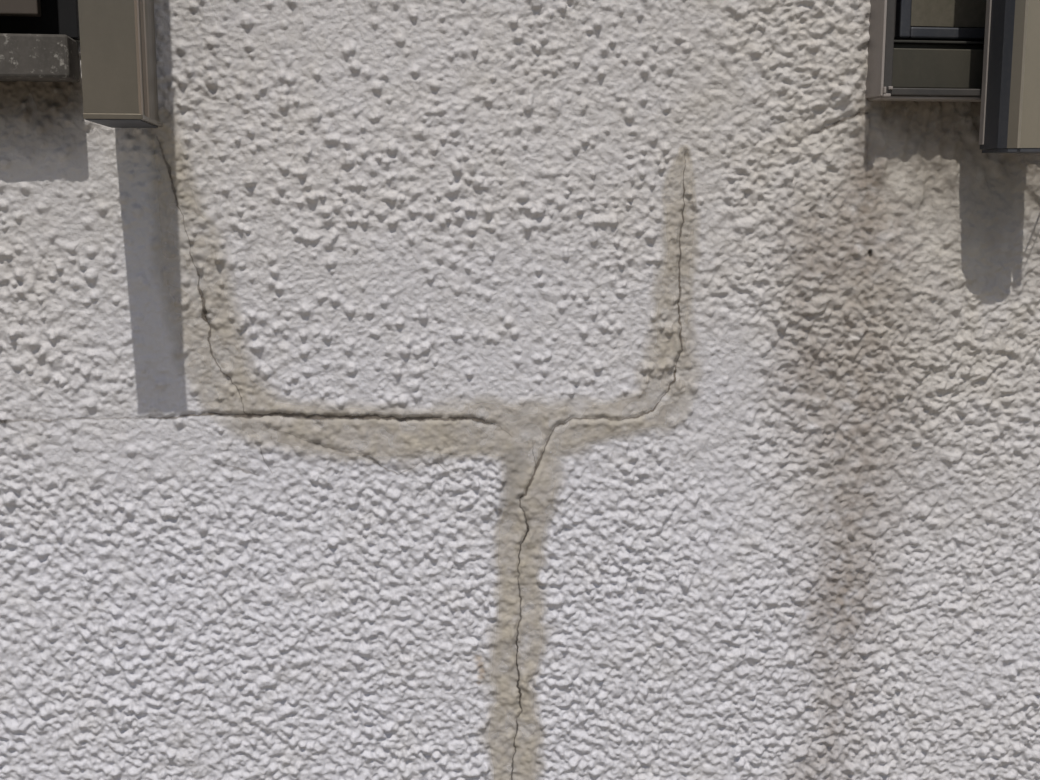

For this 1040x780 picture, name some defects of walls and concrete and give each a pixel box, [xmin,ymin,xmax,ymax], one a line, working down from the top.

crack [156,136,184,217]
crack [158,255,492,424]
crack [511,160,686,779]